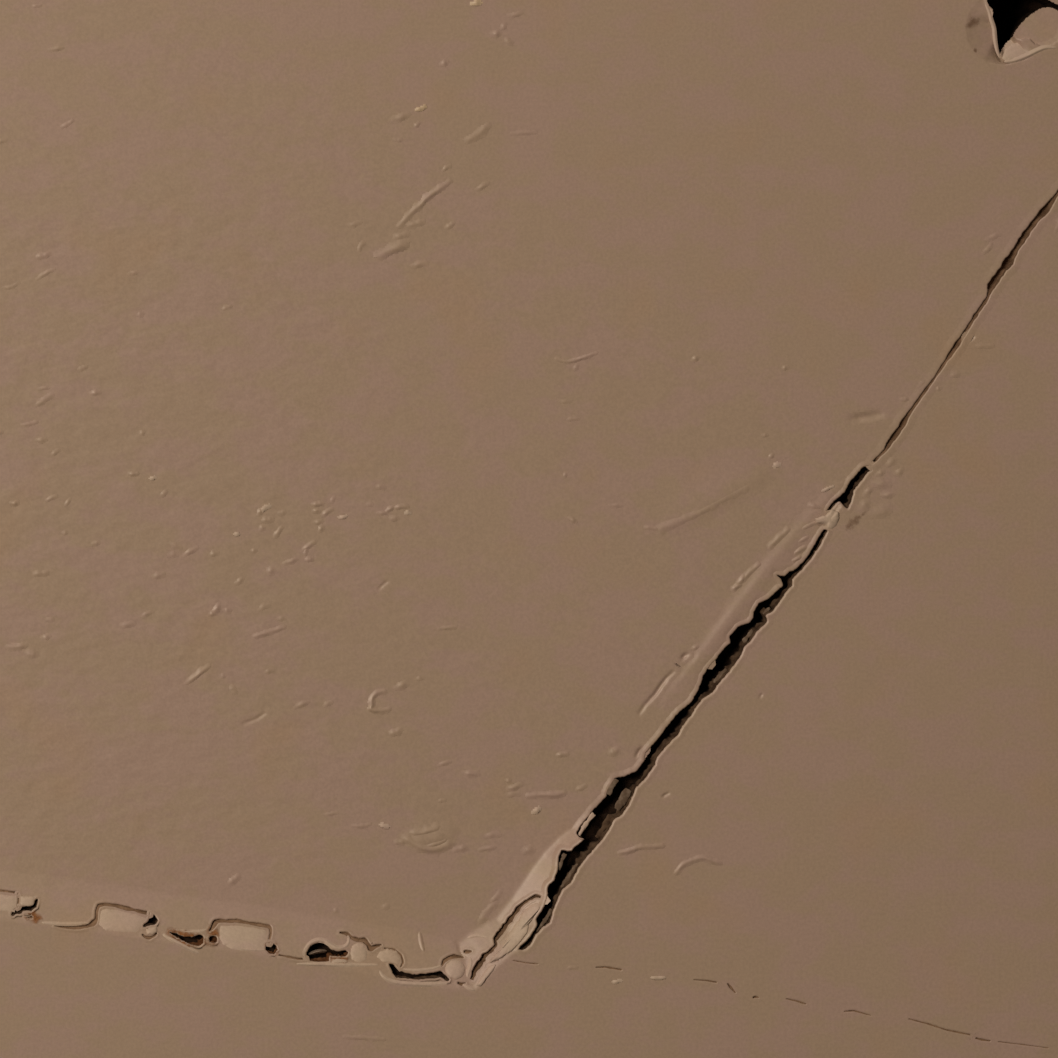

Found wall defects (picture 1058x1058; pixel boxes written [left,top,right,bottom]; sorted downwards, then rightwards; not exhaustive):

spalling [960,0,1058,70]
crack [466,179,1058,985]
crack [689,975,810,1009]
crack [904,1015,1053,1053]